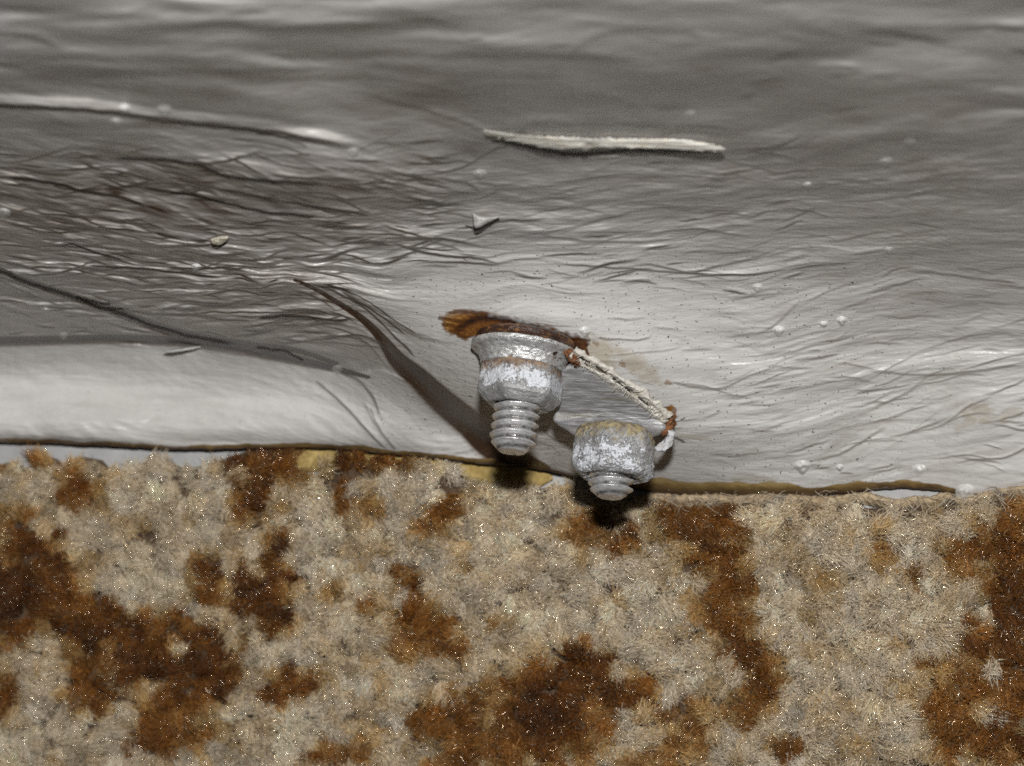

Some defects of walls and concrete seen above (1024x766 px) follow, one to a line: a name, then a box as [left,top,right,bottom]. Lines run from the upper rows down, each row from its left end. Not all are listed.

peeling [483,130,725,156]
corrosion [439,310,589,366]
peeling [567,347,673,425]
corrosion [655,405,677,452]